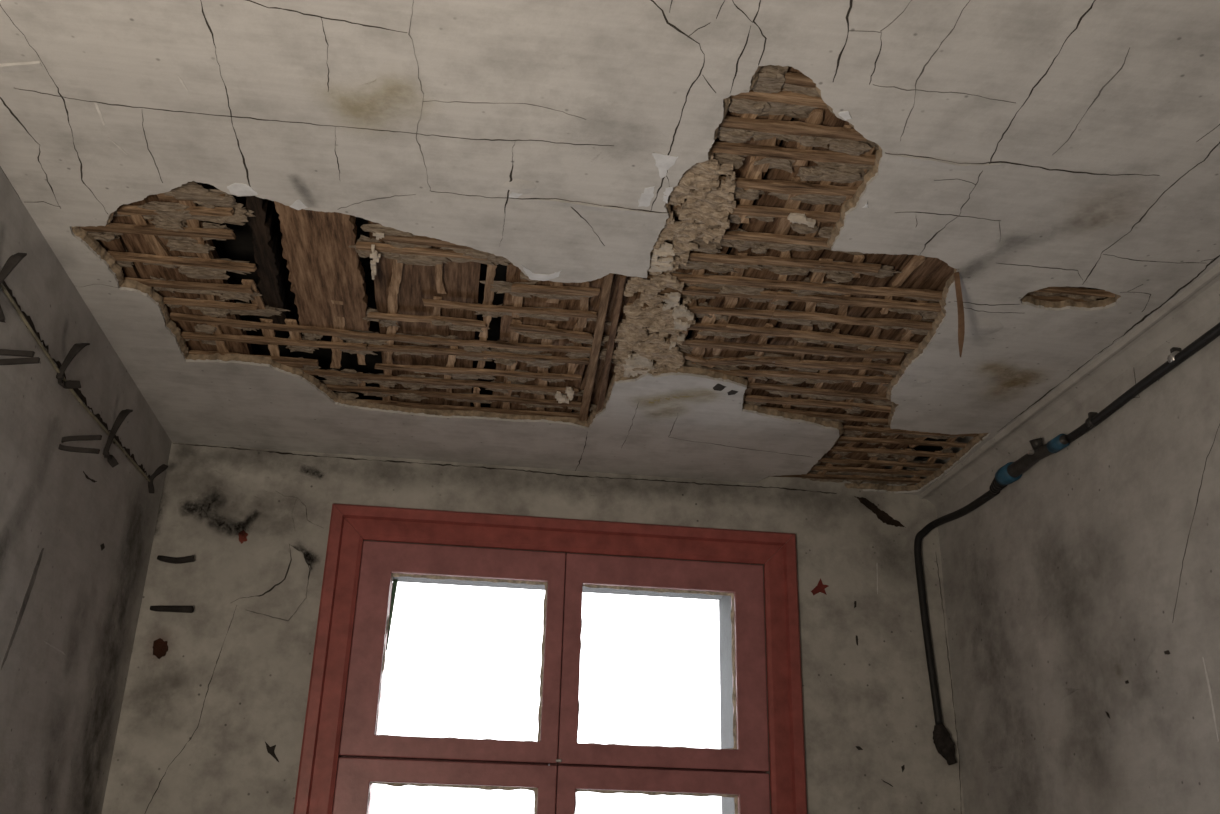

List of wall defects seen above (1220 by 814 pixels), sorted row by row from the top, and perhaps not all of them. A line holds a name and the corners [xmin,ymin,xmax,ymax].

crack [0,0,767,246]
spalling [750,66,762,90]
spalling [812,80,863,136]
spalling [827,145,882,248]
crack [833,0,1220,432]
spalling [72,97,844,455]
spalling [886,268,957,426]
spalling [1021,294,1121,308]
spalling [844,433,988,527]